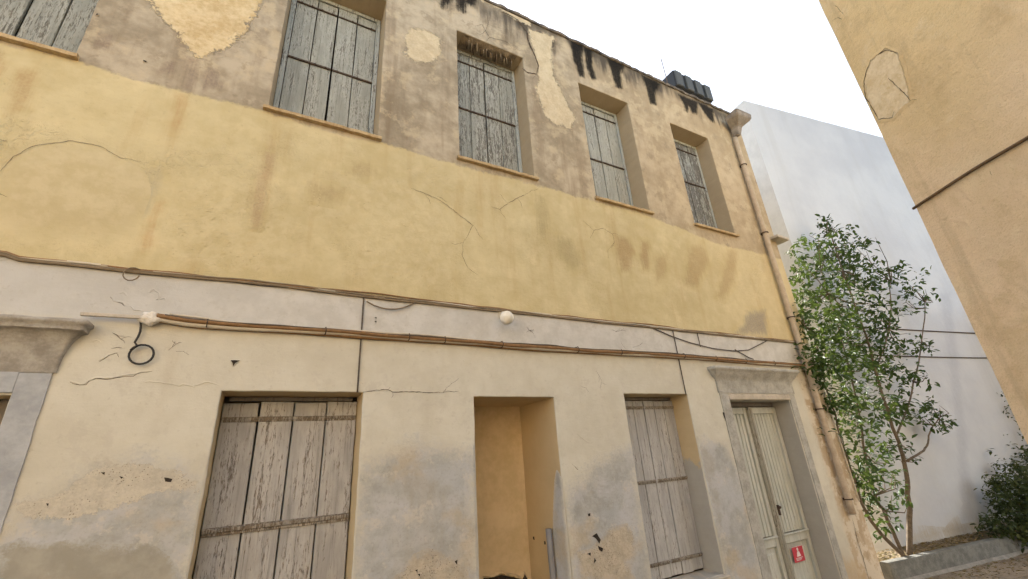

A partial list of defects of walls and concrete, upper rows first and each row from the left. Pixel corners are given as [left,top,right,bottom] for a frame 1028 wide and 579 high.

peeling [138,0,272,61]
peeling [401,25,444,67]
water stain [437,0,479,16]
flaking render [458,34,517,69]
peeling [479,0,578,133]
water stain [570,41,625,91]
water stain [641,74,661,107]
flaking render [861,45,915,123]
peeling [0,442,207,579]
peeling [353,431,529,579]
peeling [553,434,652,579]
peeling [697,432,763,579]